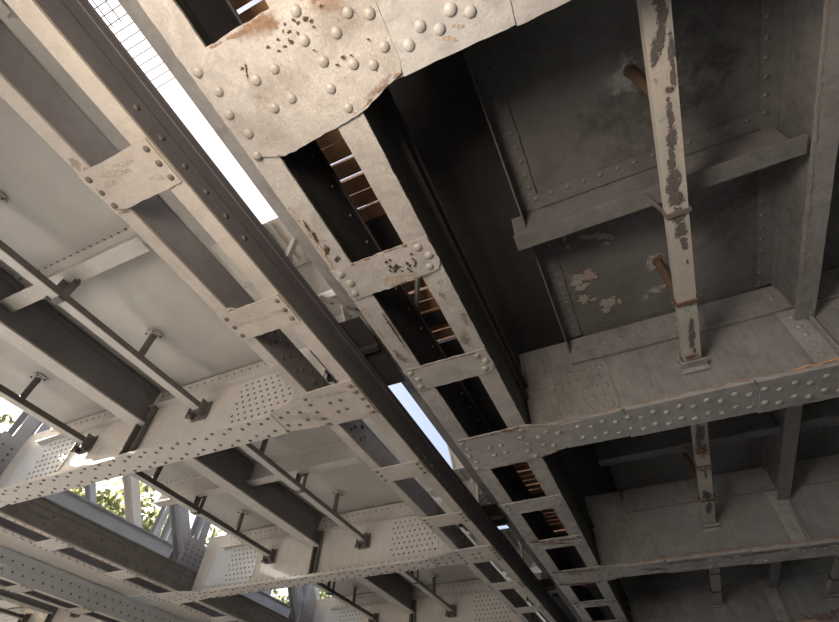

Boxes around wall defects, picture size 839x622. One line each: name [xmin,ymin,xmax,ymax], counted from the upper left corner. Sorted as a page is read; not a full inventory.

peeling [649,0,689,250]
peeling [569,268,622,313]
peeling [684,304,696,353]